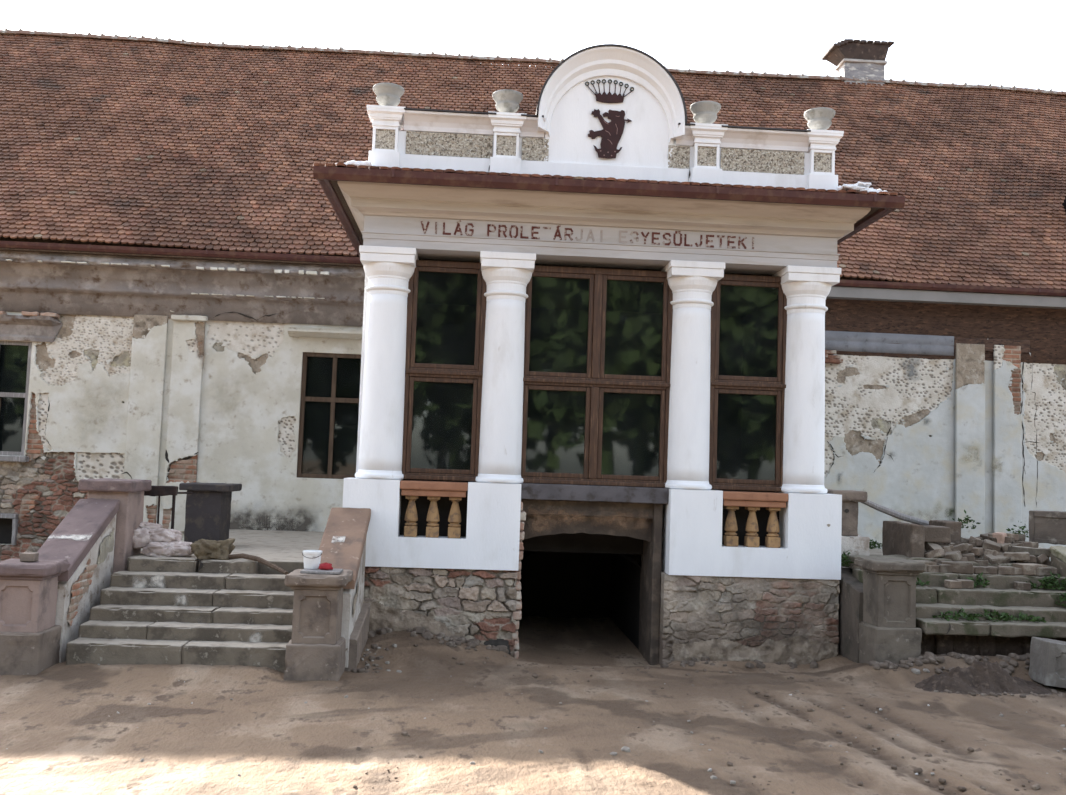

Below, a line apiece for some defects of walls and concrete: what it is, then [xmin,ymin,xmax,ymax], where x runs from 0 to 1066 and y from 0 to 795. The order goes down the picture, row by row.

flaking render [36,314,76,372]
flaking render [68,348,131,371]
flaking render [133,310,173,339]
flaking render [194,321,226,356]
flaking render [237,352,270,375]
flaking render [836,365,890,390]
flaking render [946,339,988,390]
flaking render [1002,345,1031,415]
flaking render [26,393,52,462]
flaking render [844,409,930,464]
crack [1021,362,1039,506]
flaking render [166,454,207,483]